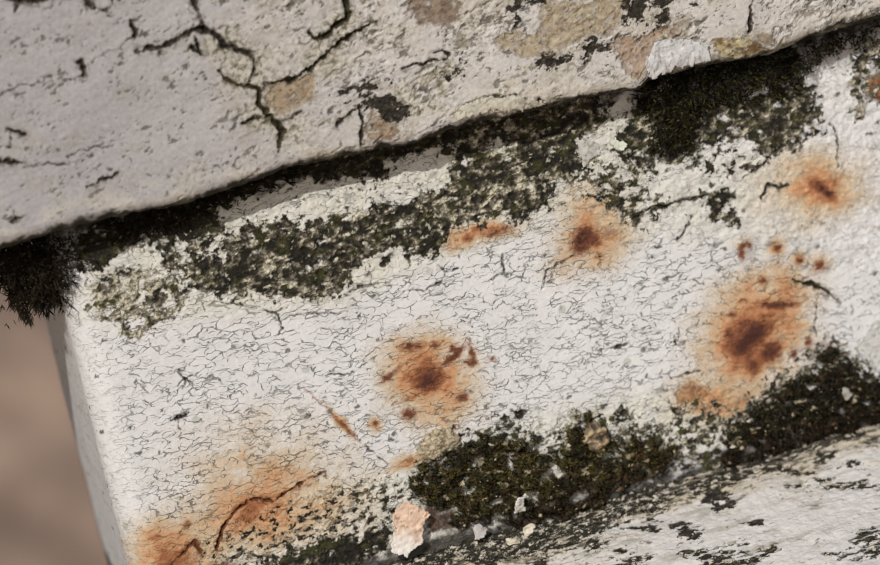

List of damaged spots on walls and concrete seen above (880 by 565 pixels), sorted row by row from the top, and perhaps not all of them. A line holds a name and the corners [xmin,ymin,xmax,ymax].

crack [1,58,93,95]
crack [84,0,377,153]
spalling [410,0,462,26]
spalling [494,0,776,79]
crack [0,128,107,167]
corrosion [773,153,859,218]
corrosion [557,194,629,273]
corrosion [678,238,827,420]
crack [792,278,840,336]
corrosion [382,333,477,429]
corrosion [128,447,350,565]
crack [171,471,326,565]